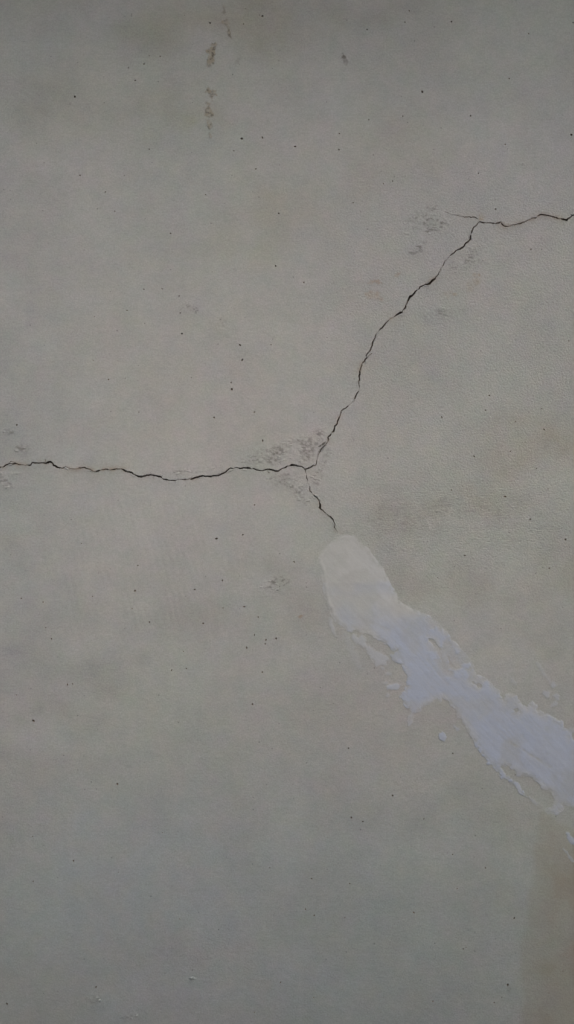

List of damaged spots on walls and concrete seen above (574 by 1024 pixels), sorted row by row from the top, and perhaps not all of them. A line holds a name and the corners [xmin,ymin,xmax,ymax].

crack [0,212,574,529]